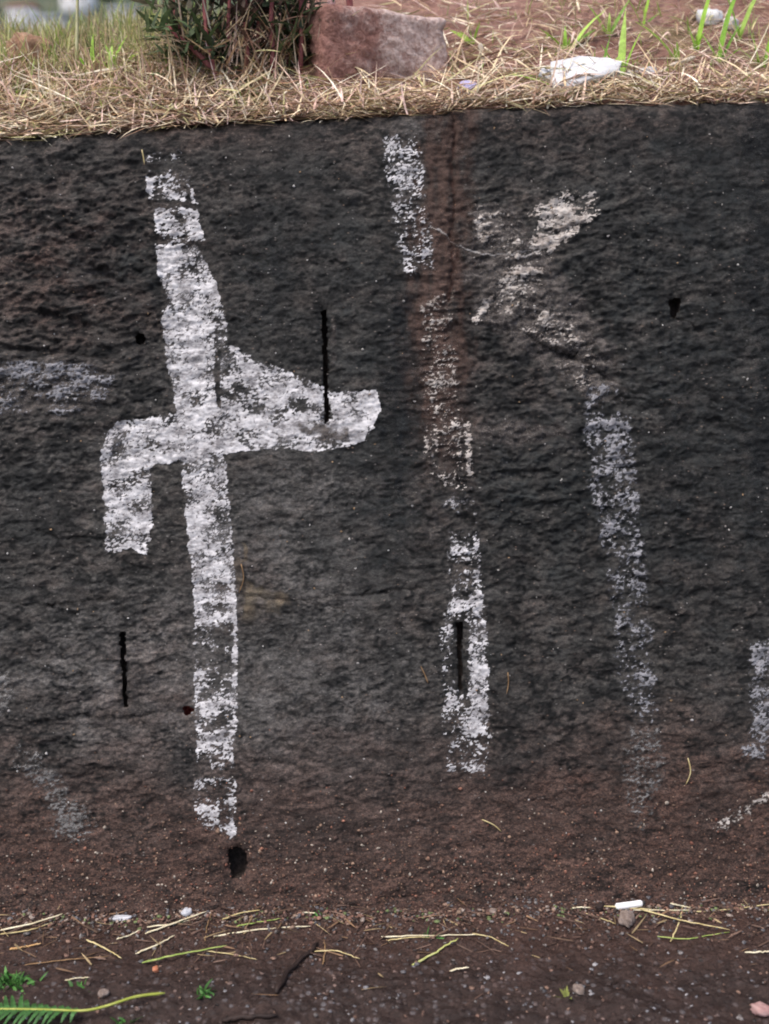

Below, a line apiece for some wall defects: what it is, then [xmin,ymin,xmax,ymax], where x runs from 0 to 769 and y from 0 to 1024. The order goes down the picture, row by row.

corrosion [403,109,479,472]